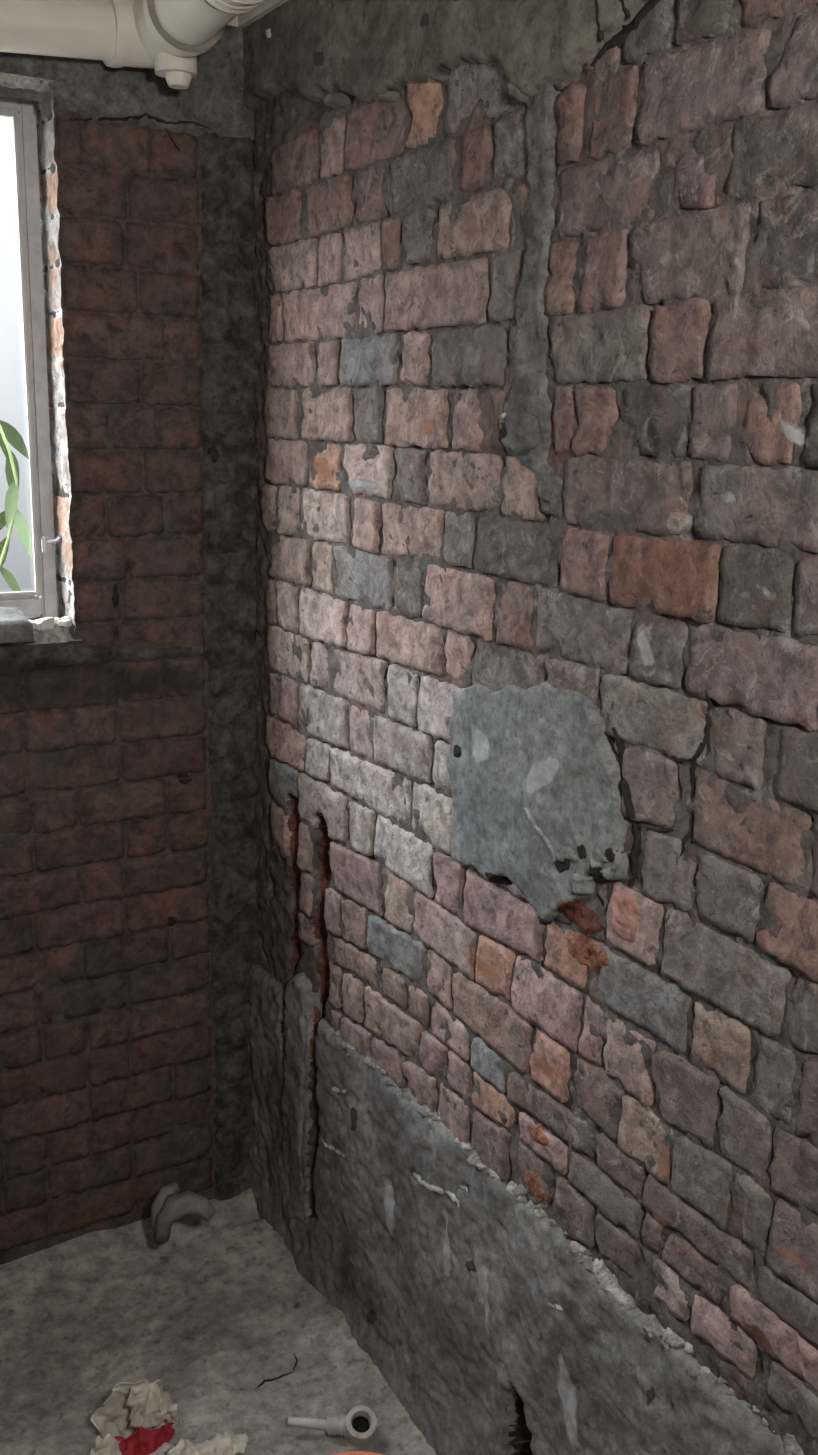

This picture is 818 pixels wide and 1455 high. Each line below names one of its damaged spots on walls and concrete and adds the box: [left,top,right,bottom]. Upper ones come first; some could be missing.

peeling [242,0,646,112]
crack [590,0,660,67]
spalling [556,892,641,974]
spalling [334,1029,805,1455]